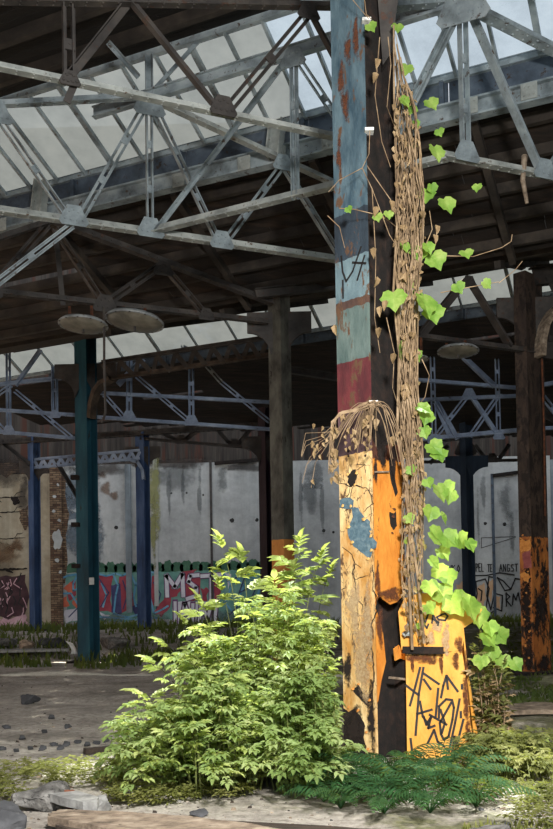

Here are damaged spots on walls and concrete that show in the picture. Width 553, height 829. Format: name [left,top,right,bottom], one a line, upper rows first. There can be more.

corrosion [338,17,359,120]
peeling [346,469,358,487]
peeling [340,498,377,560]
peeling [343,581,372,754]
corrosion [520,568,549,671]